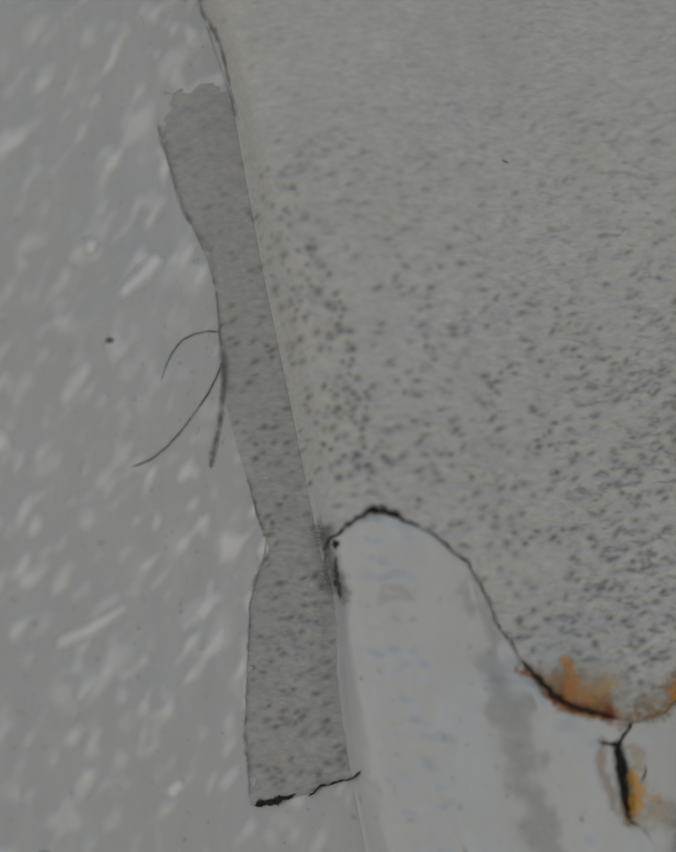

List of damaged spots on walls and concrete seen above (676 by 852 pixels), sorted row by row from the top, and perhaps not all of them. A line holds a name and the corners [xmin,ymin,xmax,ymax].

crack [322,505,675,827]
corrosion [515,657,676,729]
corrosion [599,744,670,823]